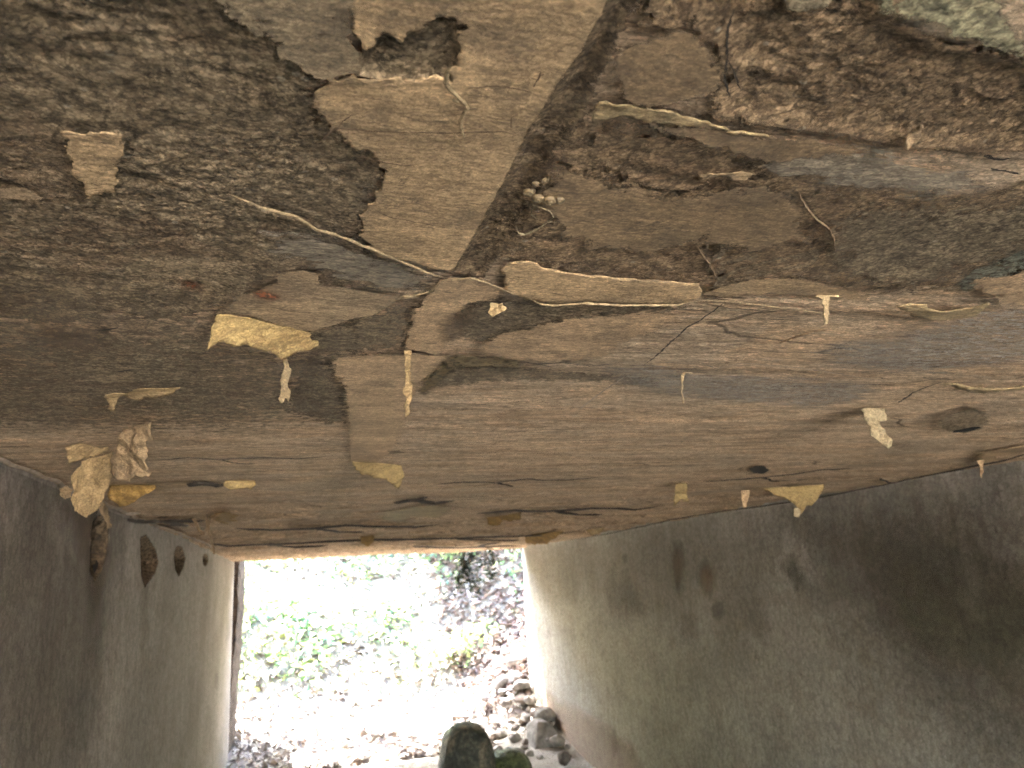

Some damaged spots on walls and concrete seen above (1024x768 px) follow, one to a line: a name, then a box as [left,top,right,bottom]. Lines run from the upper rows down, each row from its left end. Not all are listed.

spalling [0,0,1024,587]
crack [520,303,944,405]